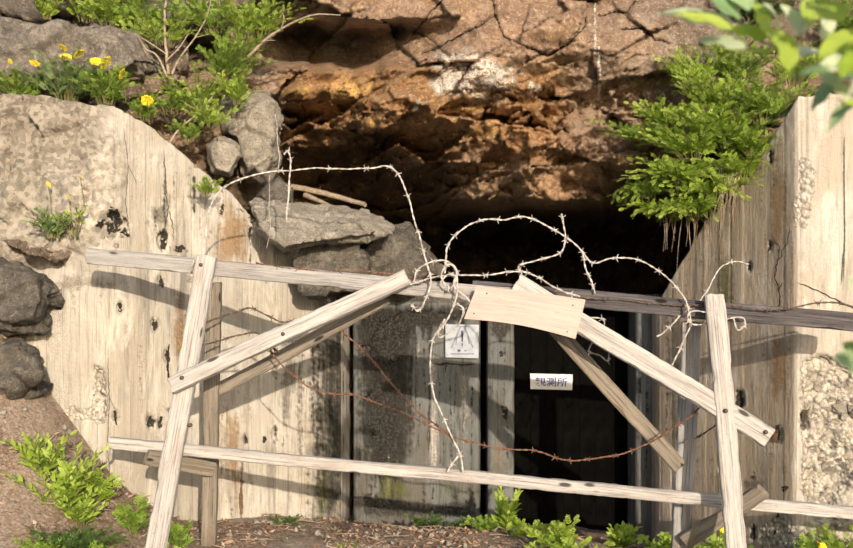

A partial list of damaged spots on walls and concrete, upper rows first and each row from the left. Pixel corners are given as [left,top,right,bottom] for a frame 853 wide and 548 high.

spalling [92,207,130,248]
corrosion [210,206,251,261]
crack [772,136,853,308]
spalling [63,365,117,425]
leakage [275,359,302,418]
leakage [302,330,344,458]
leakage [357,306,469,464]
spalling [800,355,853,506]
leakage [316,470,341,518]
leakage [364,474,475,519]
spalling [813,516,849,527]